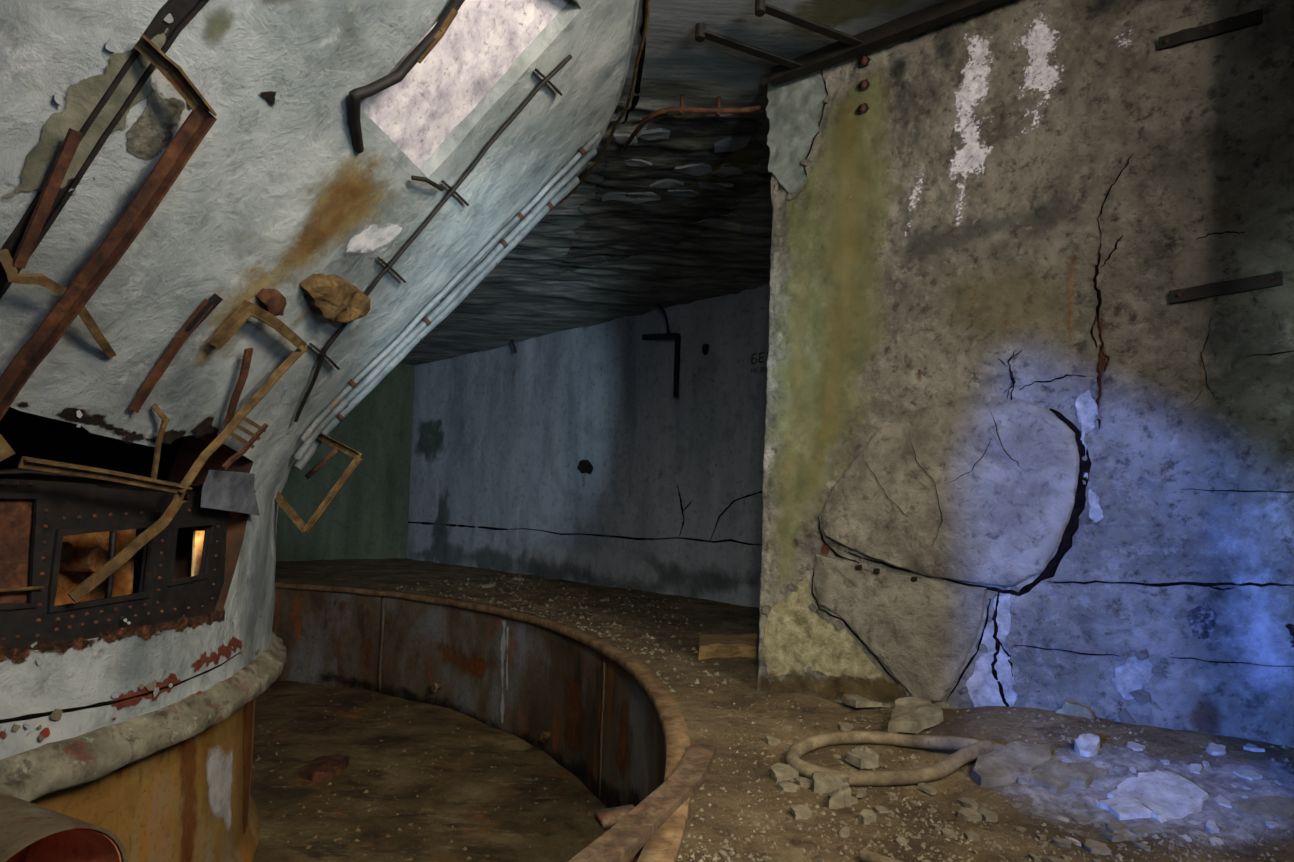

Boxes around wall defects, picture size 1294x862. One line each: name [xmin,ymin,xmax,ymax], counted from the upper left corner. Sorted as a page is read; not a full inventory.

peeling [3,14,185,198]
crack [622,0,646,124]
spalling [555,71,831,274]
leakage [1013,5,1064,138]
rust [128,160,383,479]
leakage [772,30,999,577]
crack [998,153,1134,429]
crack [408,484,762,545]
crack [844,551,1119,707]
crack [1046,580,1294,590]
crack [1171,657,1294,667]
rust [181,736,196,862]